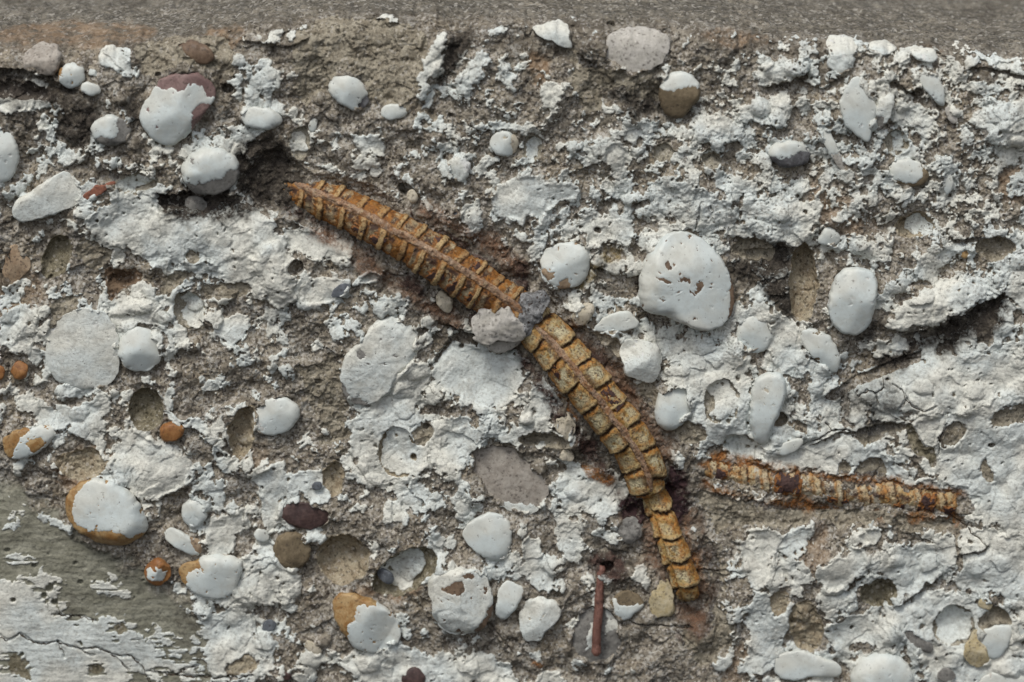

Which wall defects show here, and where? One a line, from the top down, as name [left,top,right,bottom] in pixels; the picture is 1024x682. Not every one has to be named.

peeling [689,55,810,151]
peeling [76,185,385,332]
corrosion [283,180,528,329]
peeling [648,175,824,249]
peeling [885,226,1024,331]
peeling [0,381,331,682]
peeling [295,341,563,487]
corrosion [516,307,708,638]
peeling [568,323,754,447]
corrosion [701,450,962,525]
peeling [682,311,1024,682]
peeling [340,644,519,682]